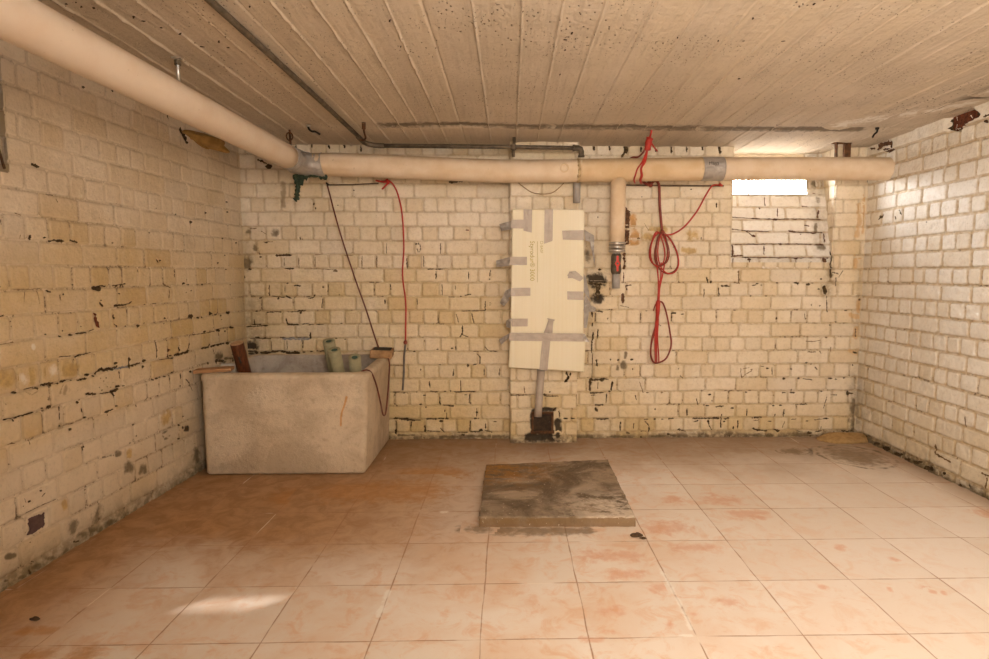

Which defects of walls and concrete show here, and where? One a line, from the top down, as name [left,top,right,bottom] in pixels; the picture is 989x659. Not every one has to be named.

water stain [522,406,628,443]
water stain [101,445,151,478]
water stain [845,394,989,499]
flaking render [27,512,45,543]
water stain [2,495,119,585]